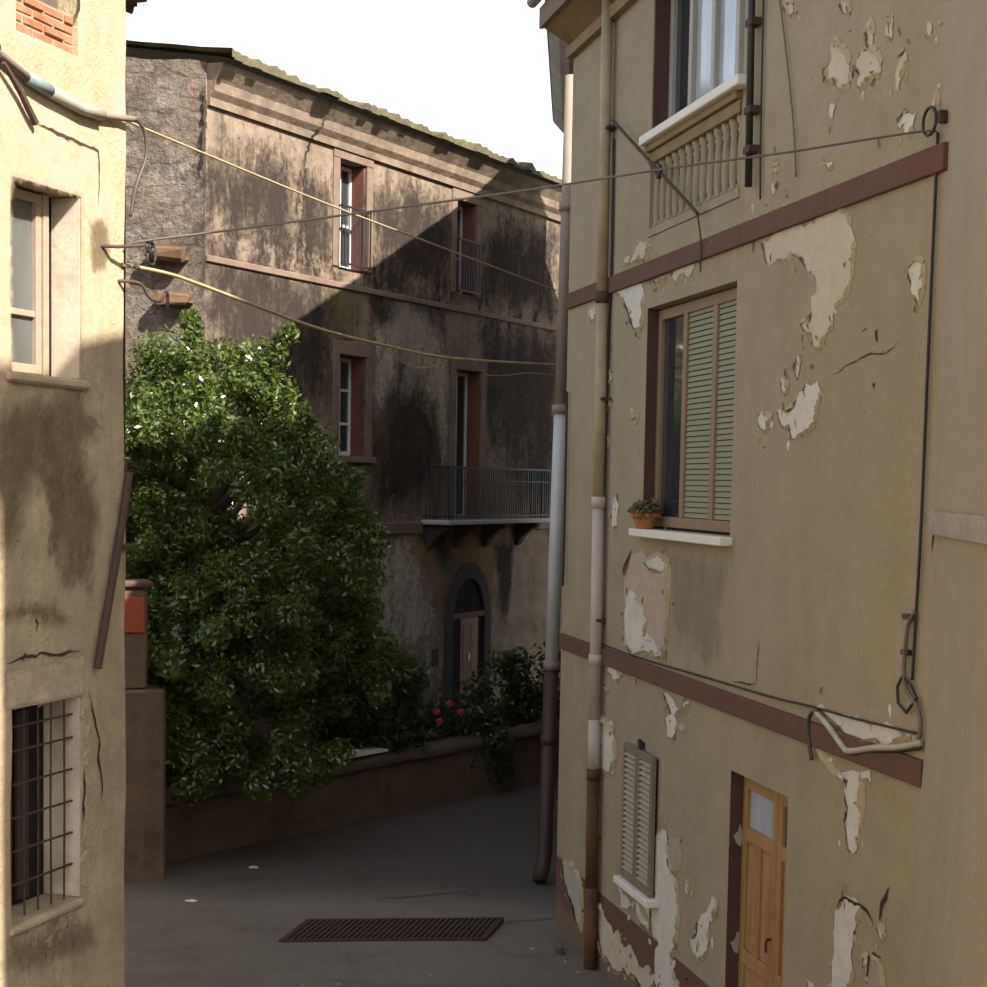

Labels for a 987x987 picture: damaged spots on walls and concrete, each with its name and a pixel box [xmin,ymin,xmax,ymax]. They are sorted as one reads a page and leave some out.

peeling [822,0,909,132]
water stain [201,143,345,409]
water stain [360,178,460,522]
water stain [471,216,559,503]
peeling [752,208,857,450]
water stain [0,394,95,580]
crack [7,618,82,664]
flaking render [616,548,673,665]
peeling [814,748,875,854]
peeling [560,855,584,932]
peeling [597,815,718,987]
peeling [826,880,887,987]